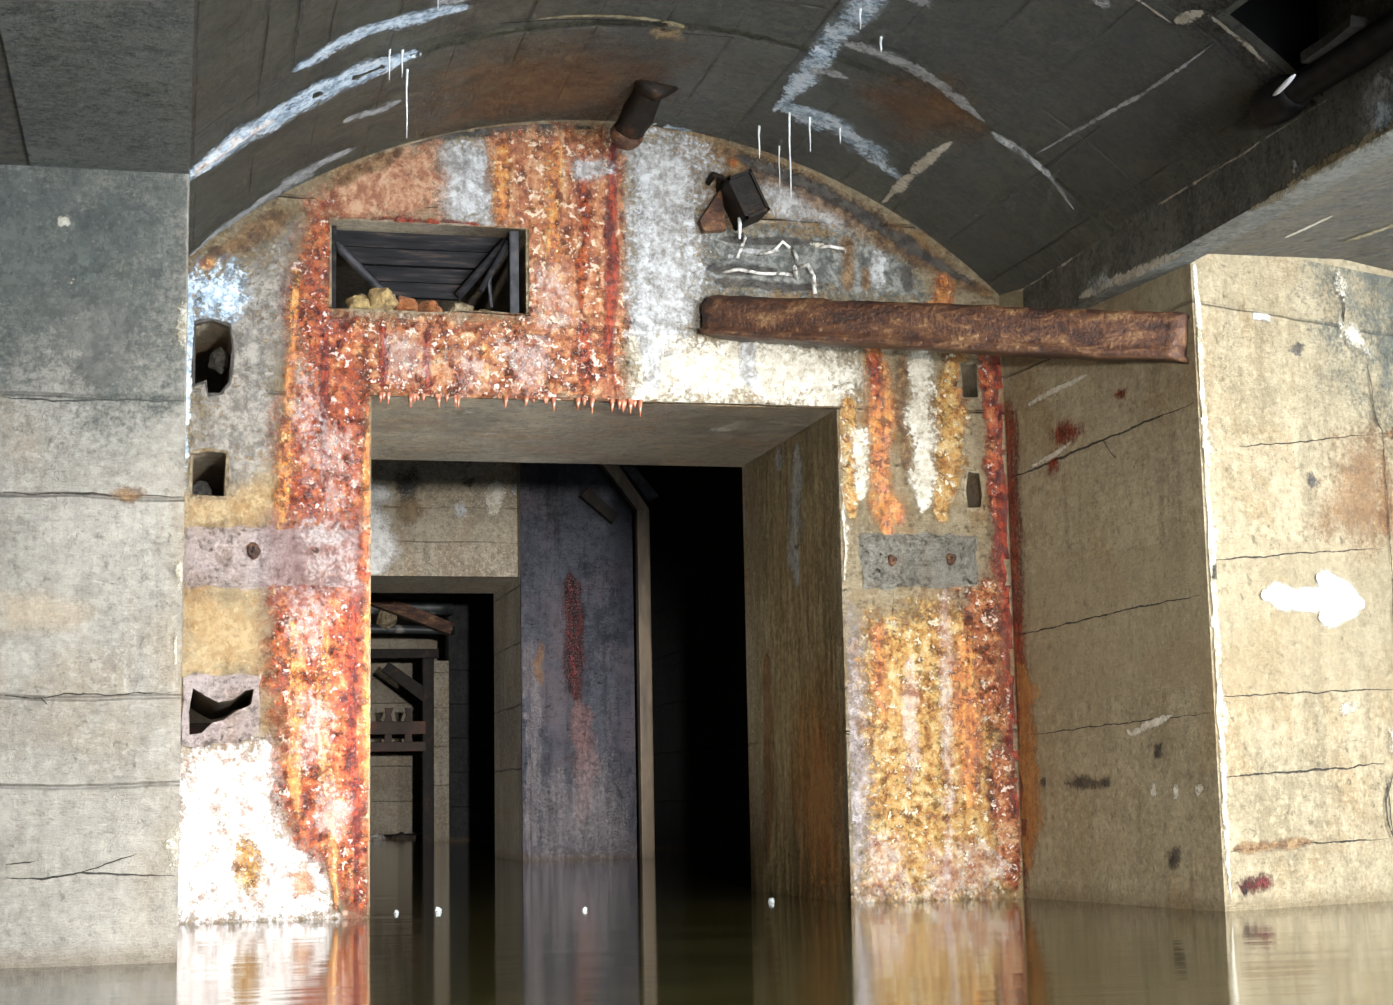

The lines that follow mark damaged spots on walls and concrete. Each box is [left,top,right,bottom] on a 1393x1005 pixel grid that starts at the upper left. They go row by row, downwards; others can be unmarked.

water stain [772,0,984,204]
spalling [174,301,235,398]
spalling [187,447,230,501]
water stain [371,468,423,574]
rust [199,122,643,918]
crack [1217,268,1393,607]
rust [746,348,1042,903]
spalling [173,636,262,748]
crack [985,689,1393,742]
water stain [178,735,348,923]
rust [1236,873,1273,896]
crack [1229,728,1393,854]